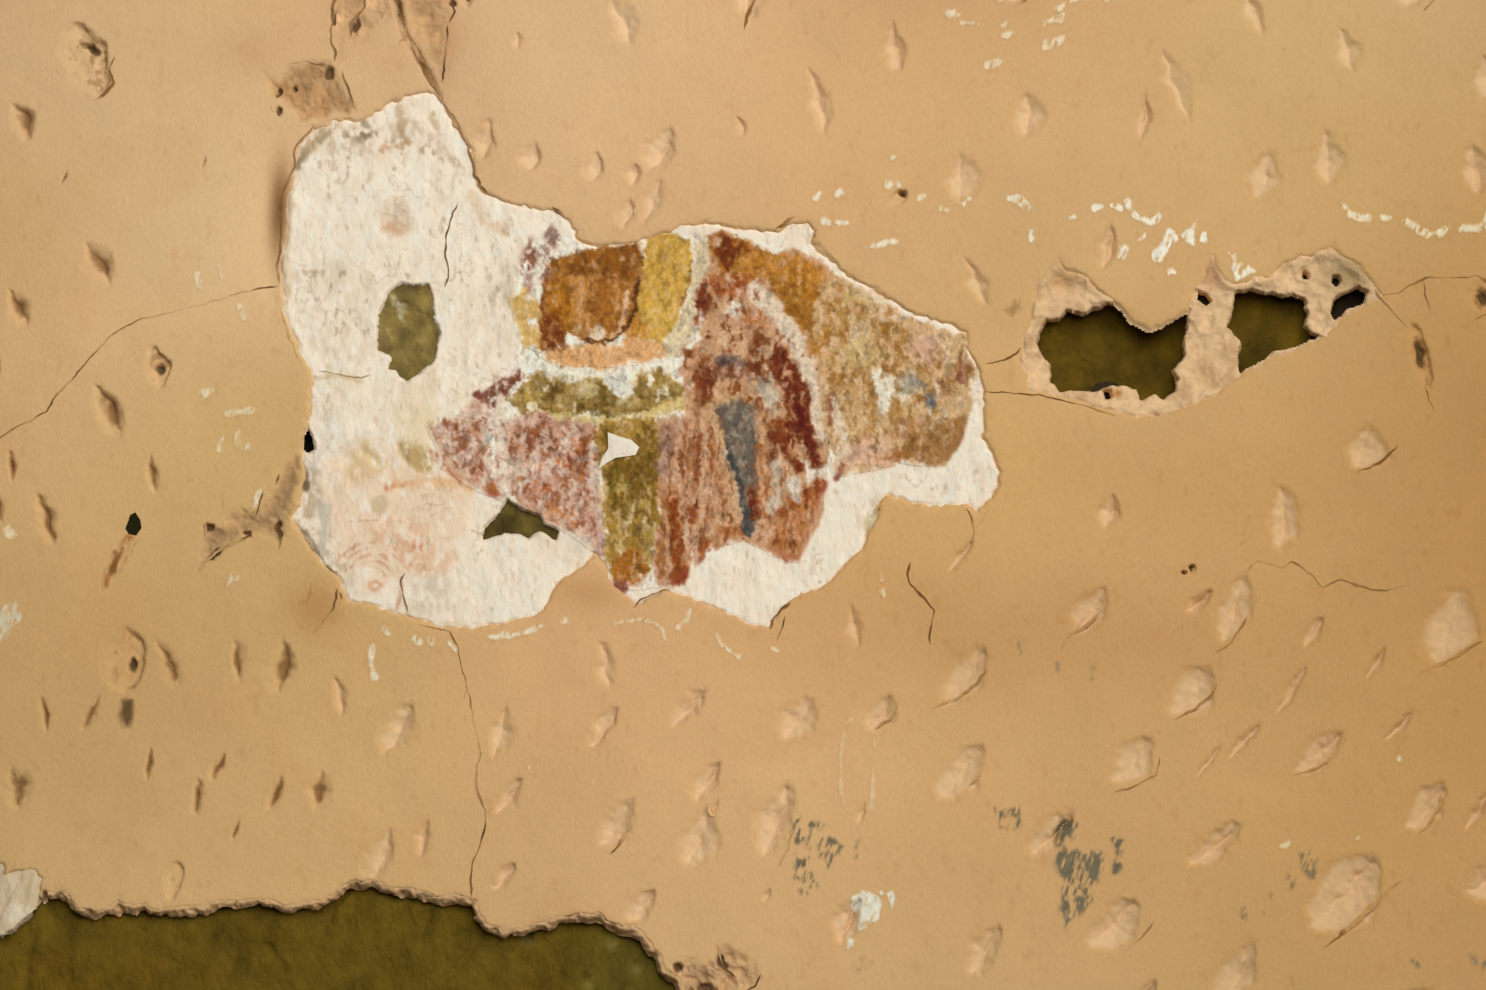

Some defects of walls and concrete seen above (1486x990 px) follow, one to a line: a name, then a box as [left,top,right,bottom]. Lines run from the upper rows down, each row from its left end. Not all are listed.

crack [330,0,487,192]
crack [0,127,313,439]
spalling [193,0,688,682]
spalling [624,187,967,336]
crack [776,216,816,236]
peeling [884,179,973,214]
spalling [1020,197,1383,418]
spalling [616,355,999,627]
crack [635,589,671,606]
crack [771,602,791,643]
crack [419,624,494,897]
spalling [0,864,765,990]